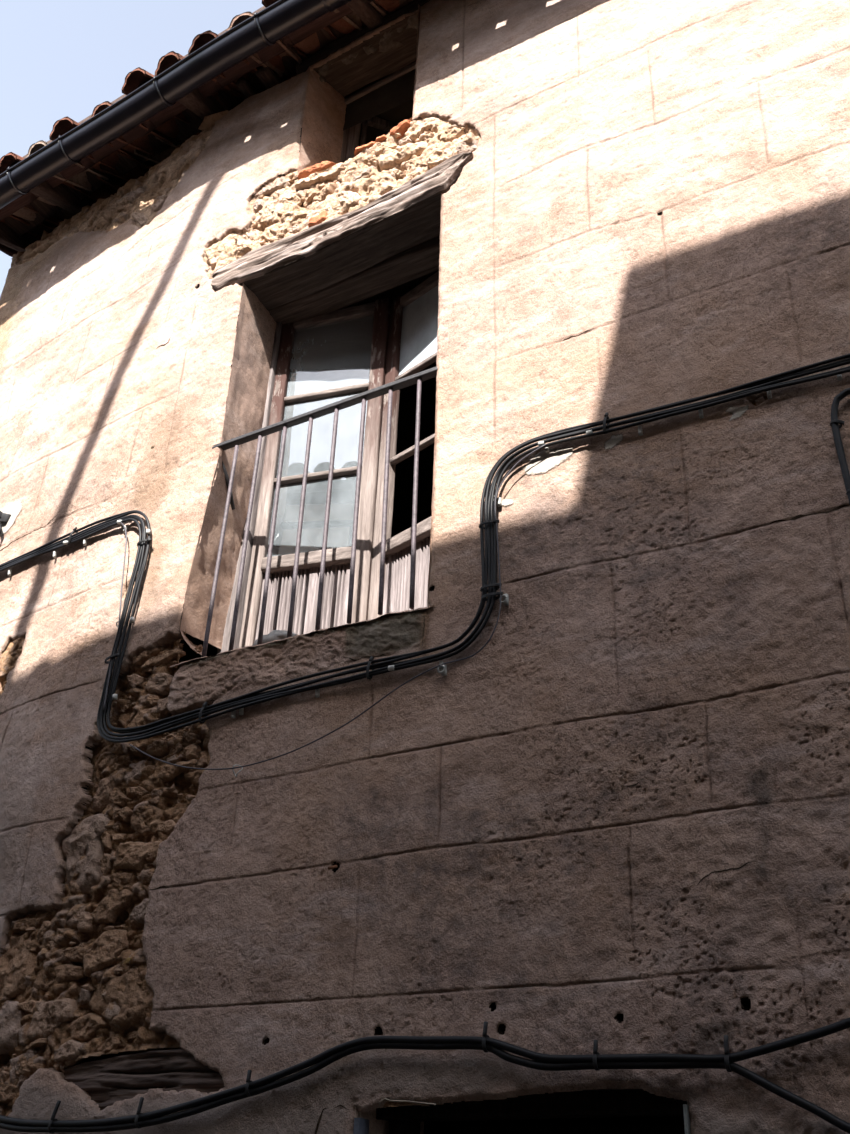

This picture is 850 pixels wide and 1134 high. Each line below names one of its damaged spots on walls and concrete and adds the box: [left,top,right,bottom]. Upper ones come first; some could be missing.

spalling [11,126,214,268]
spalling [203,113,481,279]
spalling [0,631,210,1116]
crack [698,861,755,884]
crack [314,1105,348,1134]